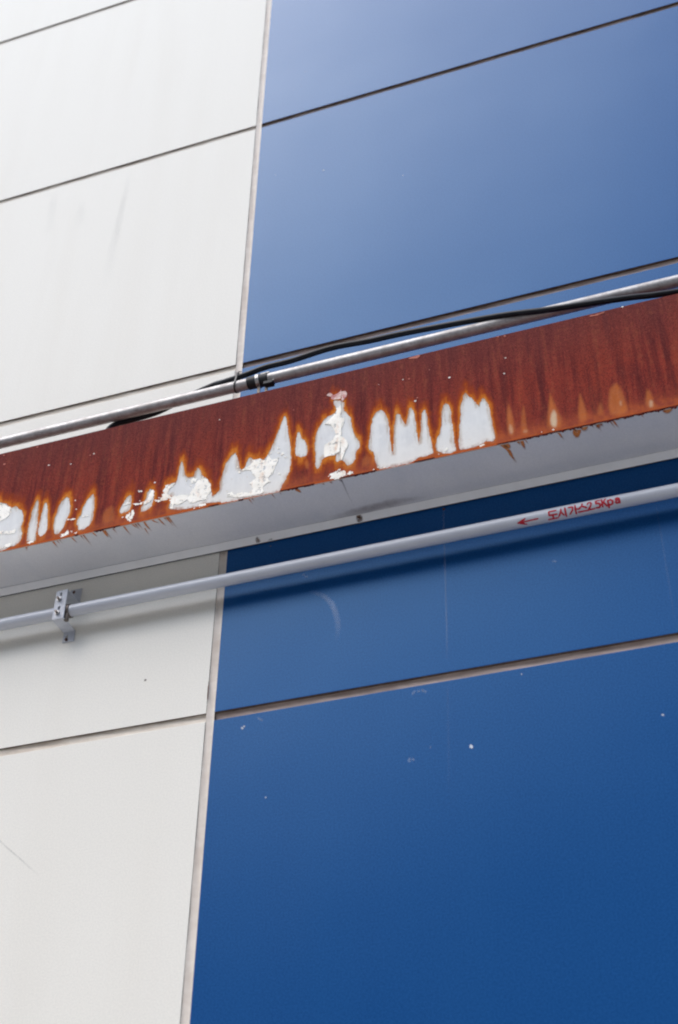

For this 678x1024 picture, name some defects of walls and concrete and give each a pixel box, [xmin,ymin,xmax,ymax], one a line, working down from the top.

corrosion [0,294,678,552]
peeling [324,390,354,480]
peeling [227,447,287,498]
peeling [122,477,211,522]
peeling [0,503,16,548]